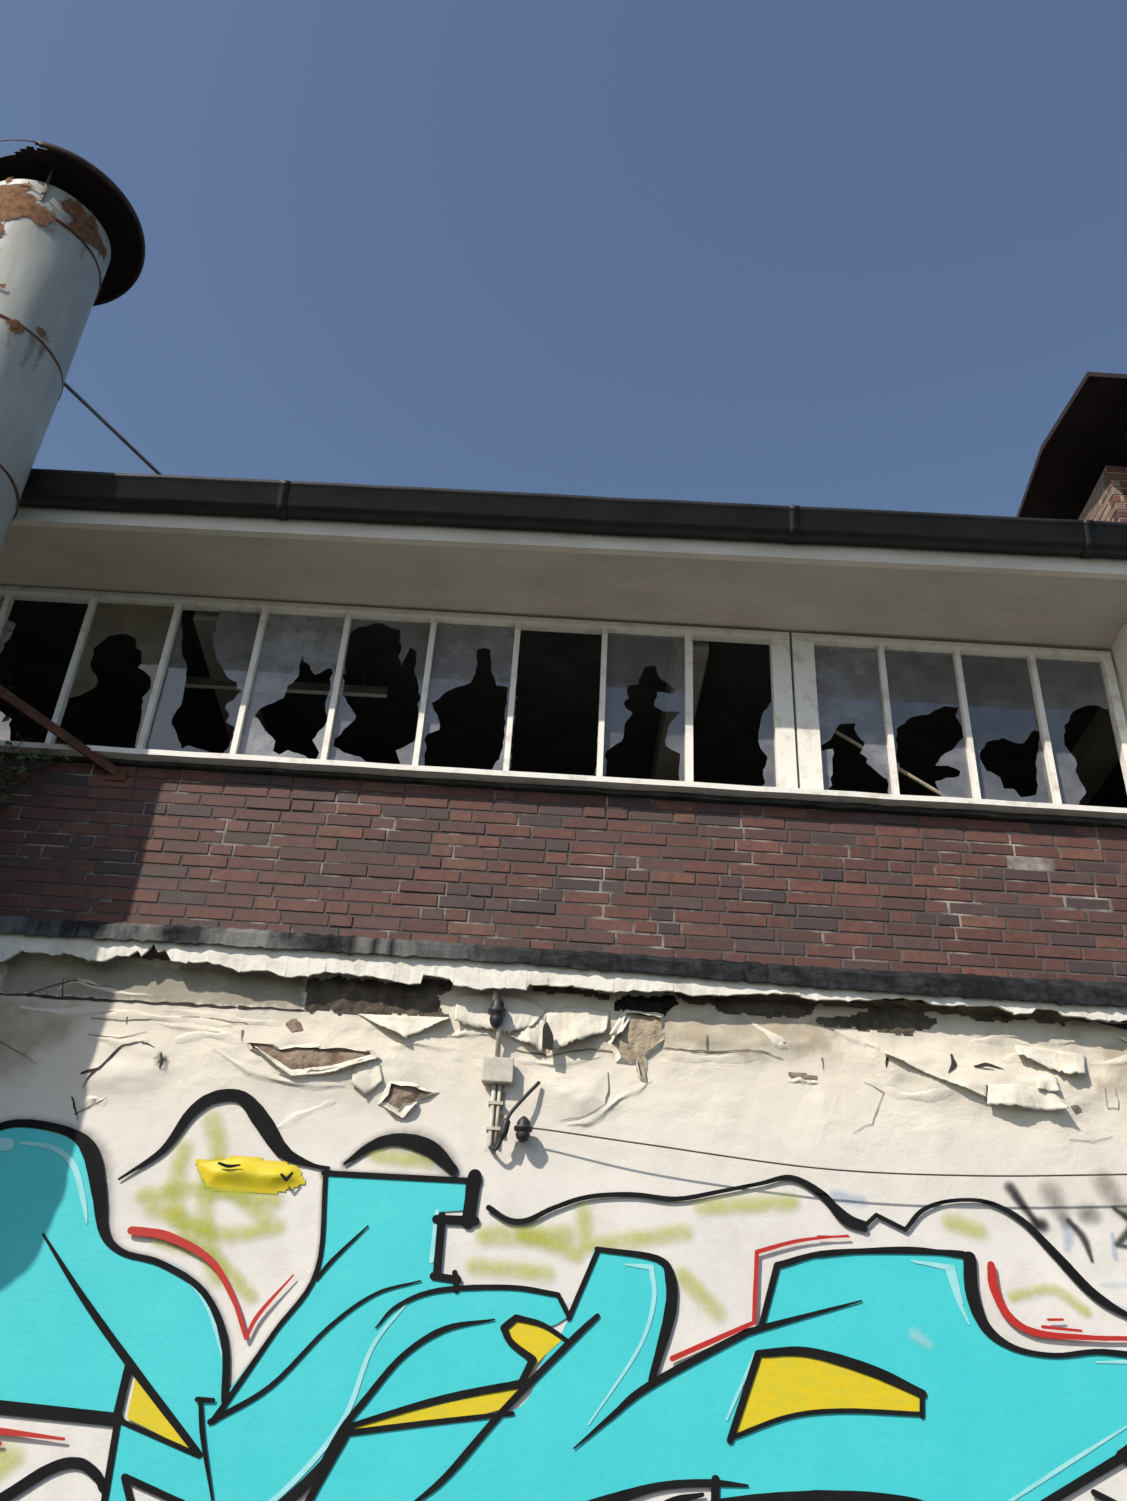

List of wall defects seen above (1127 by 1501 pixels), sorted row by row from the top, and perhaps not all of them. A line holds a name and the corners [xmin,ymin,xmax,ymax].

corrosion [0,177,107,260]
corrosion [6,319,50,353]
spalling [246,975,937,1118]
peeling [883,1045,1086,1114]
spalling [969,1014,1065,1026]